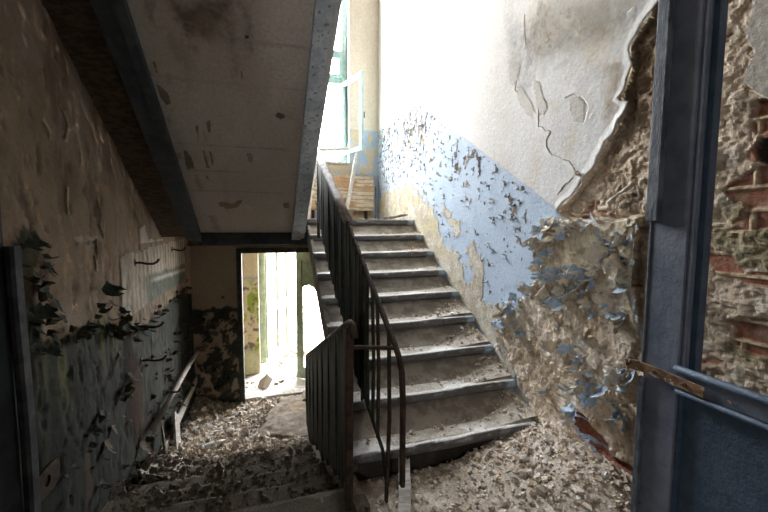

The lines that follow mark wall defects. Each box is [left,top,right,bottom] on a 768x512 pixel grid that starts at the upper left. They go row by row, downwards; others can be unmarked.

crack [512,15,576,195]
crack [565,87,595,125]
peeling [20,230,193,361]
peeling [350,0,659,484]
flaking render [701,0,768,396]
peeling [83,309,238,489]